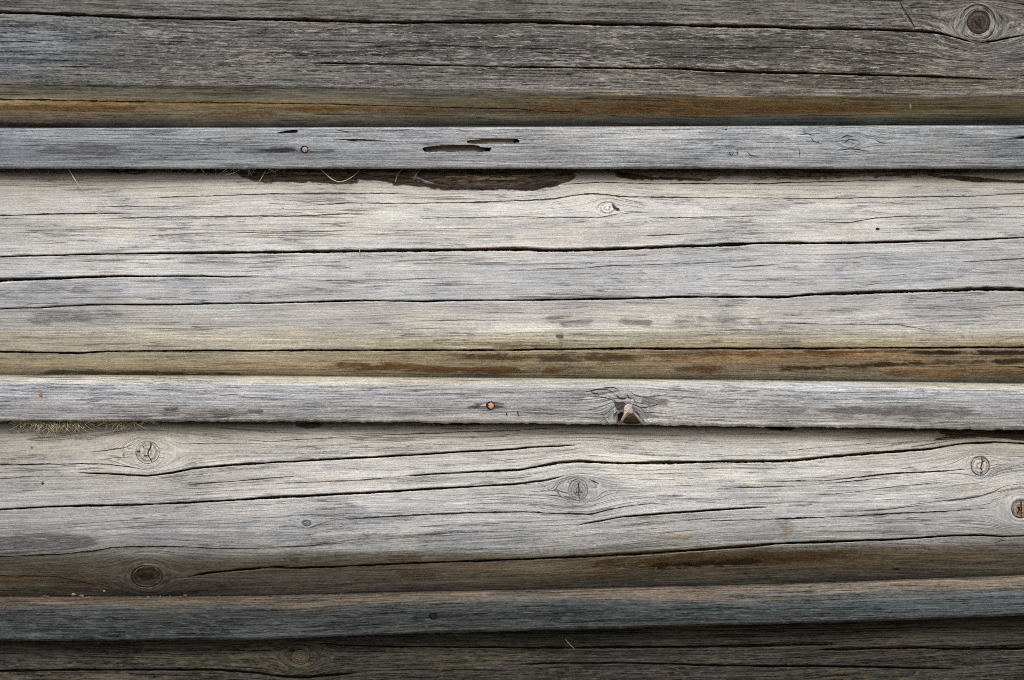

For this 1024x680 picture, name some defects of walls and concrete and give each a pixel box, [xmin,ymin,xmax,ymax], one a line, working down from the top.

crack [0,11,1024,80]
crack [0,180,1024,323]
crack [0,411,1024,584]